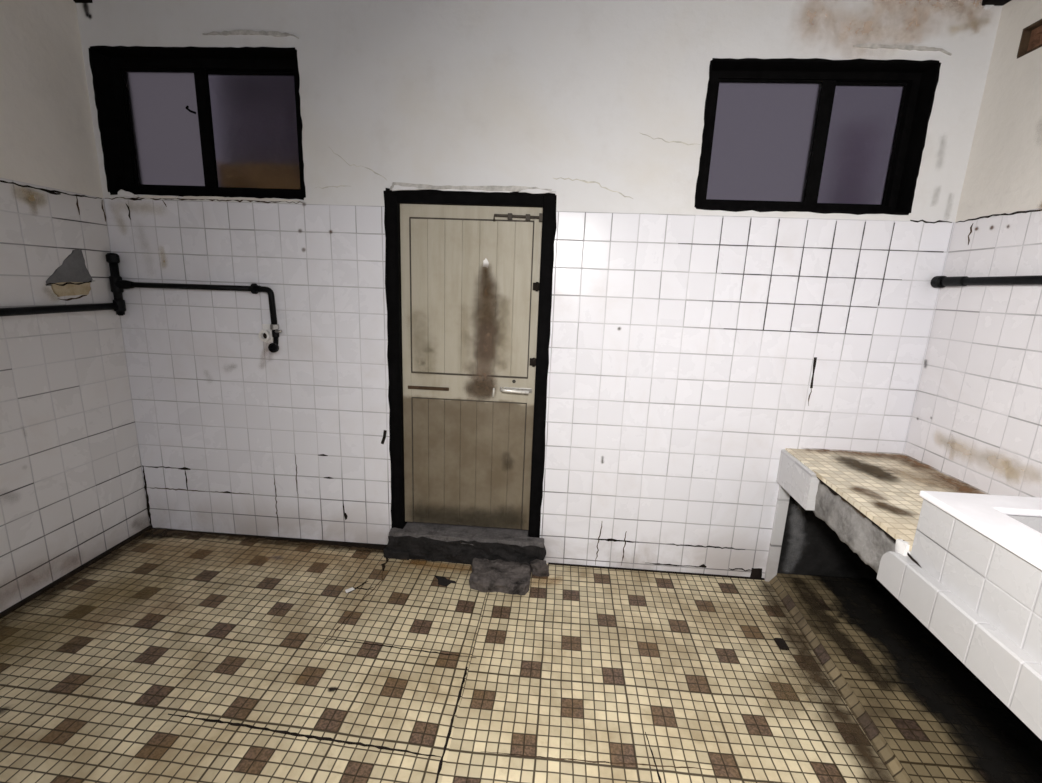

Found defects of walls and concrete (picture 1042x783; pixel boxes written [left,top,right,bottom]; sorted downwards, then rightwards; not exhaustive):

peeling [46,249,93,301]
crack [168,558,476,783]
damp [791,578,891,689]